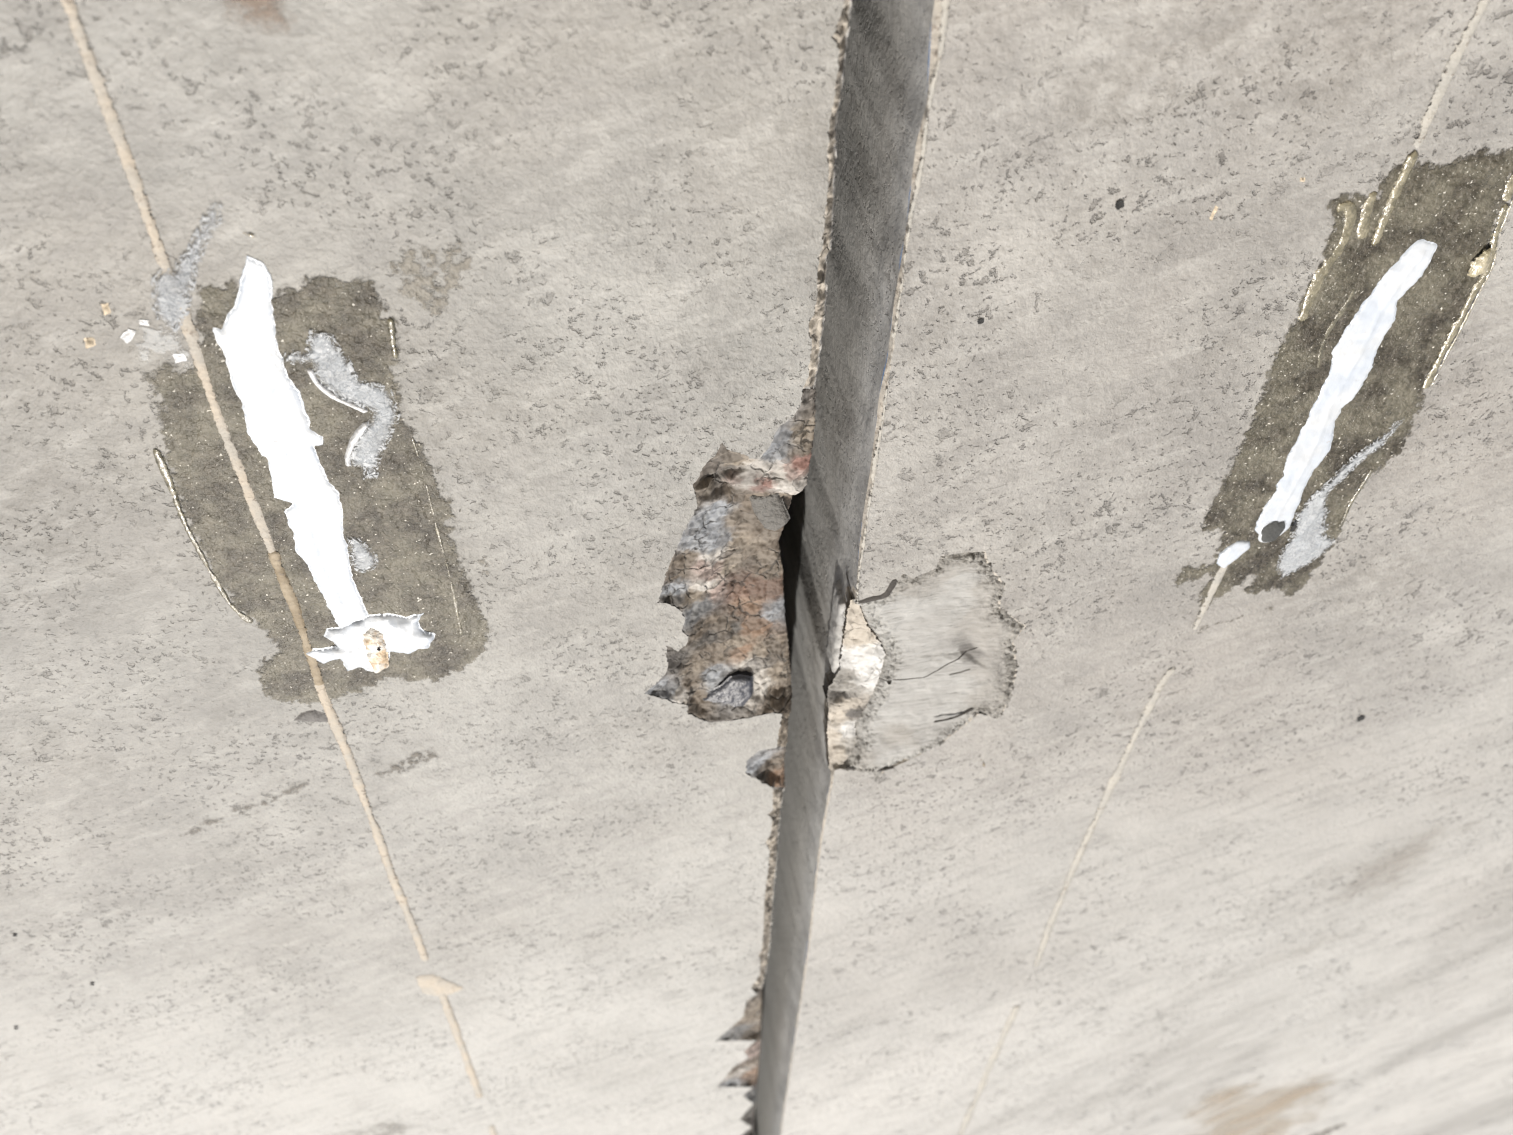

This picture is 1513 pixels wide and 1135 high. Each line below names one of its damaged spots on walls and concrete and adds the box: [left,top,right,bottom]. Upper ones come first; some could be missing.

damp [390,242,472,315]
damp [1175,148,1513,634]
damp [145,276,489,708]
spalling [645,0,852,1135]
crack [855,579,898,604]
spalling [822,586,886,770]
crack [879,647,979,685]
crack [934,708,974,723]
crack [846,765,895,773]